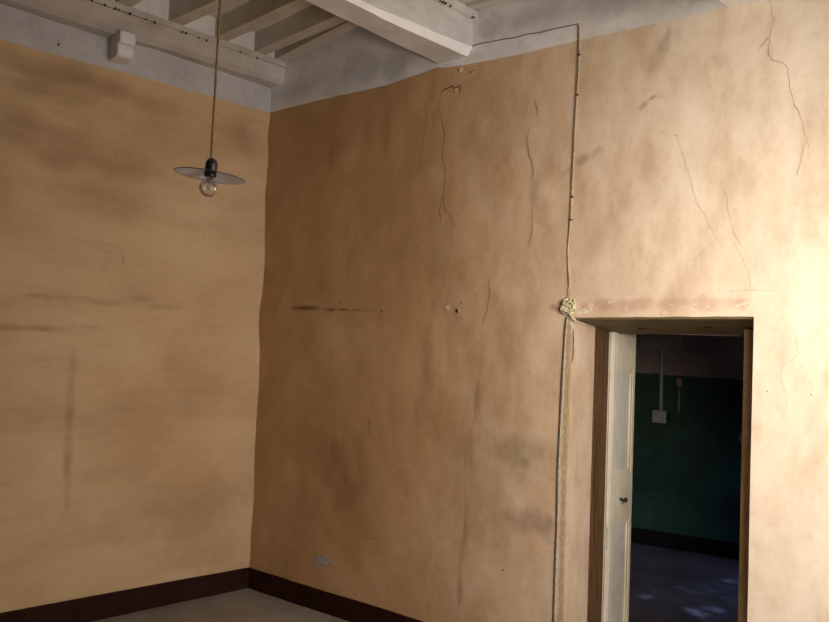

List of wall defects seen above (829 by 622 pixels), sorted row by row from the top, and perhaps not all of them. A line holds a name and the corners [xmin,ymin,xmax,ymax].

crack [433,92,459,230]
crack [526,98,538,183]
crack [675,130,778,303]
crack [758,0,810,178]